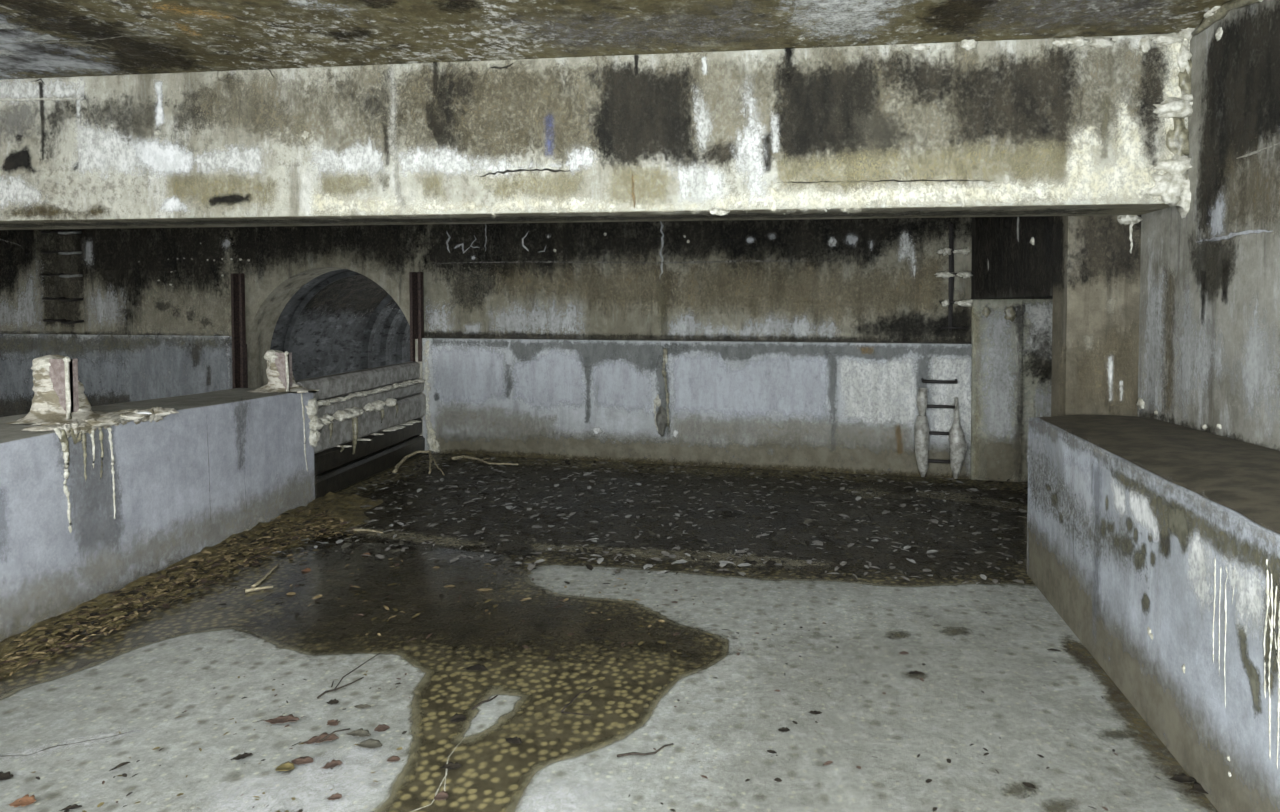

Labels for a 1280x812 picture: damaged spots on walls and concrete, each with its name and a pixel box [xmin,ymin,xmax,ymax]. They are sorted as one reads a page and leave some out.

leakage [0,0,1280,642]
leakage [0,626,433,812]
leakage [452,686,529,744]
leakage [504,523,1280,812]